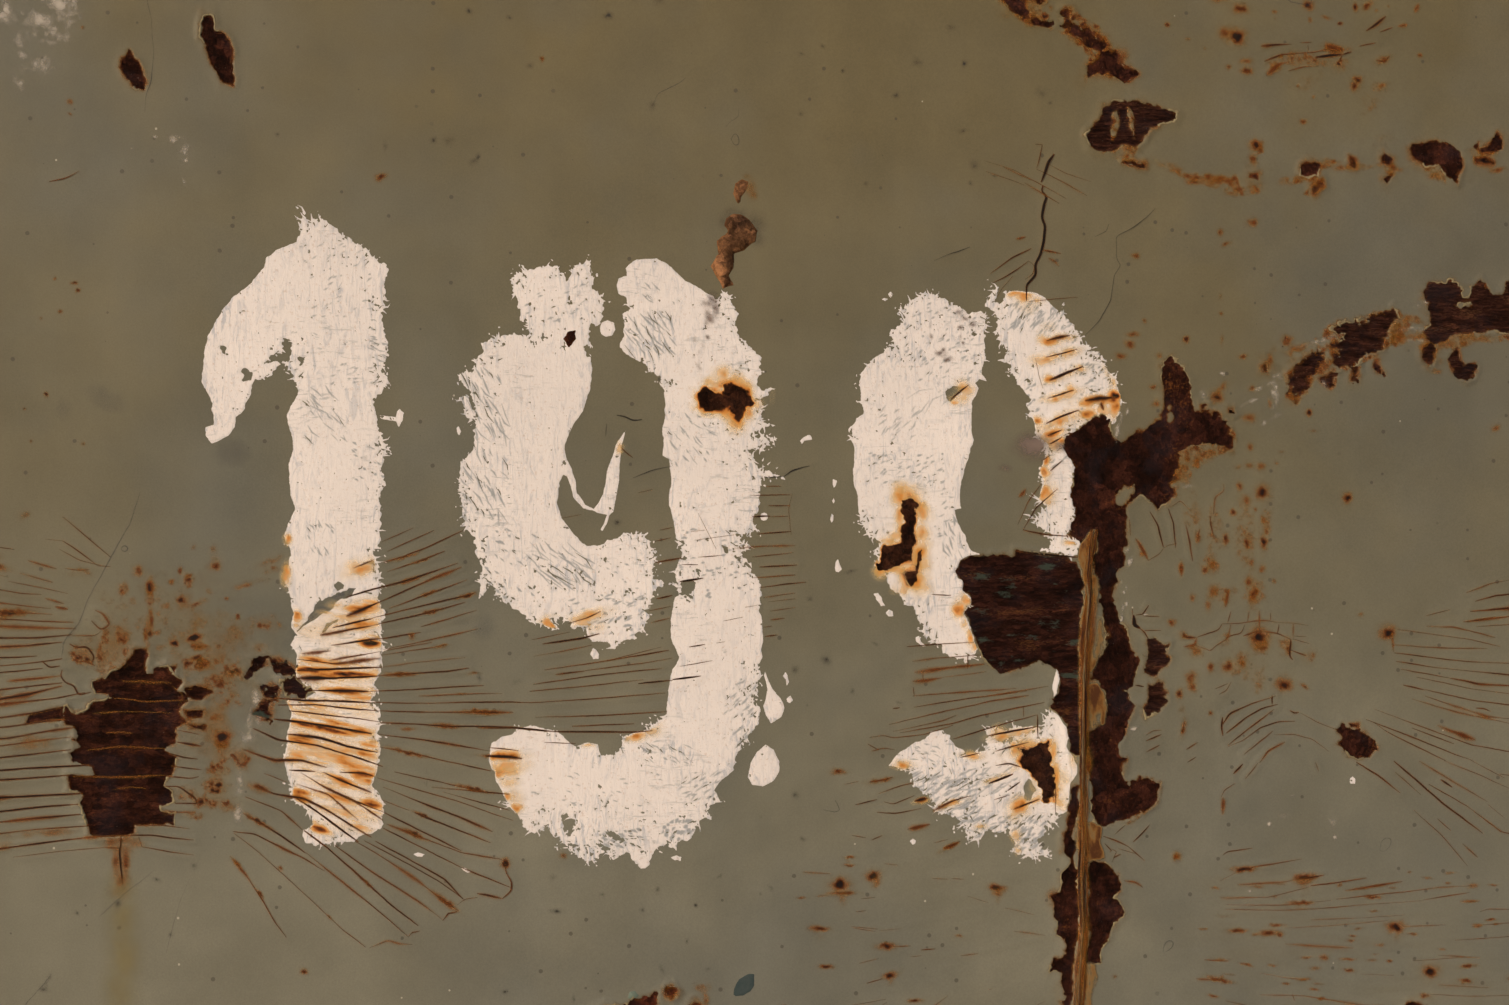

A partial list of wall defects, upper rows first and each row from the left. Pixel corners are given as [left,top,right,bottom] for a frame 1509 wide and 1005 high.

corrosion [119,49,147,91]
corrosion [198,14,235,87]
corrosion [1001,0,1179,169]
corrosion [1409,131,1503,183]
corrosion [711,179,757,288]
corrosion [694,369,756,428]
corrosion [1261,278,1509,416]
corrosion [875,487,927,593]
corrosion [952,336,1289,1005]
corrosion [25,567,414,884]
corrosion [1337,723,1378,760]
corrosion [604,986,678,1005]